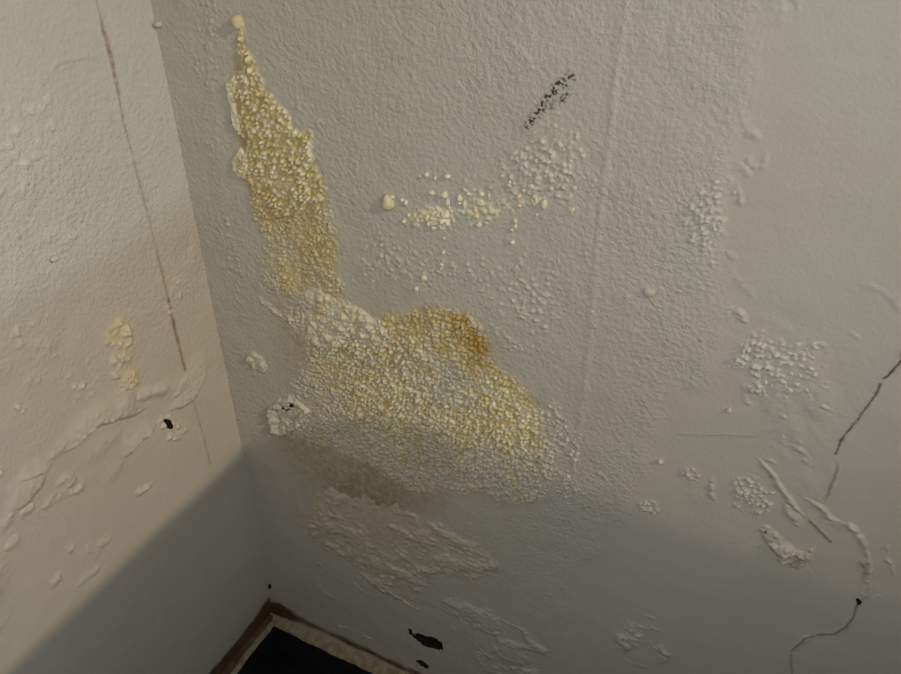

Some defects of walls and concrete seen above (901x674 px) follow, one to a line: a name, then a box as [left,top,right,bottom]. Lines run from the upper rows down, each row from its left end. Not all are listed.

leakage [225,15,575,515]
spalling [754,455,833,584]
crack [786,344,901,674]